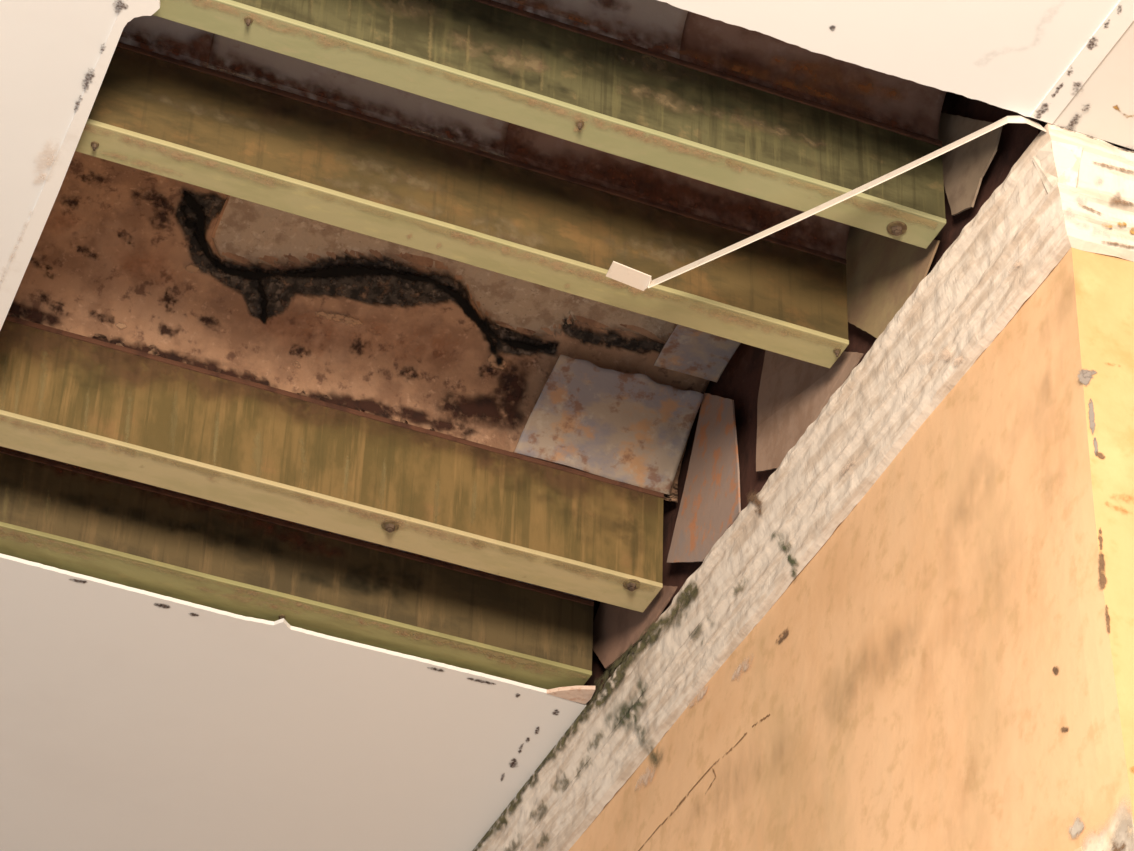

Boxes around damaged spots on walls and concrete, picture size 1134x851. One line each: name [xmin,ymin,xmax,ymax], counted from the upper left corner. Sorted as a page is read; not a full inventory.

rust [118,31,834,255]
peeling [445,72,704,156]
crack [179,193,554,366]
spalling [134,190,682,377]
rust [0,301,603,493]
spalling [748,492,762,514]
water stain [472,583,698,851]
peeling [1069,803,1134,851]